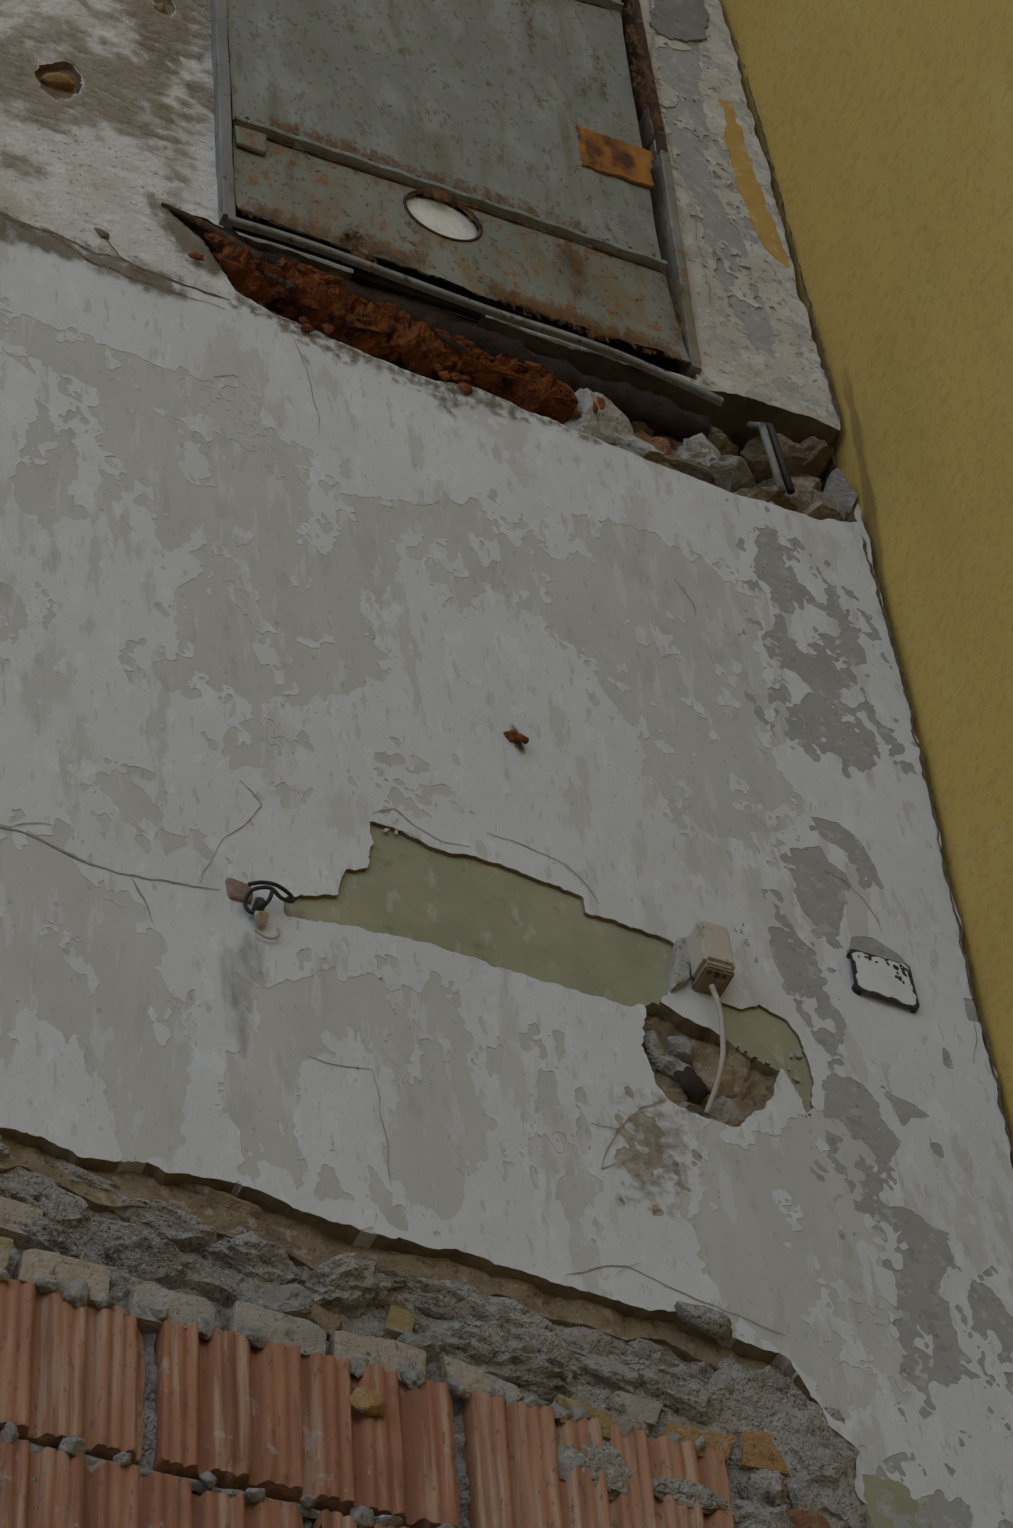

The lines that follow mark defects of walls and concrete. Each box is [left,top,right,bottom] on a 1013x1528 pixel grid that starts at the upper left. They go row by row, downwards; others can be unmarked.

flaking render [0,0,215,201]
corrosion [147,193,606,443]
corrosion [266,118,687,360]
peeling [639,0,786,359]
crack [0,781,262,922]
peeling [0,298,1013,1435]